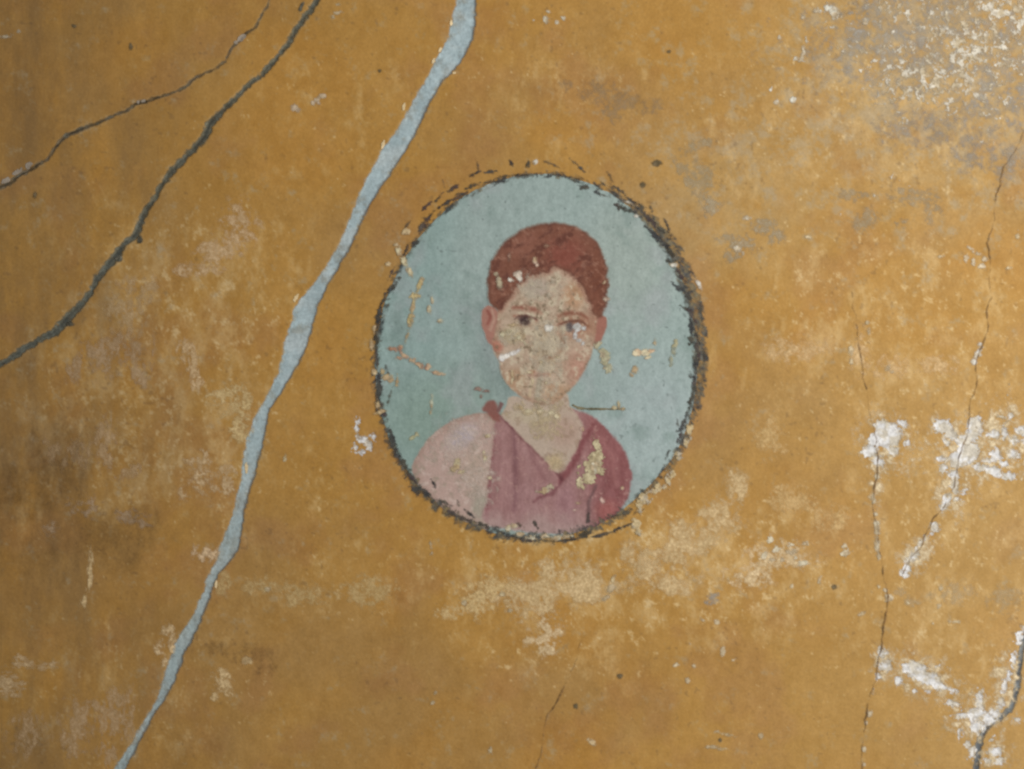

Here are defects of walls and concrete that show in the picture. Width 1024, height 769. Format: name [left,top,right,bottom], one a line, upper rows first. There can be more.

crack [0,0,320,367]
peeling [494,271,522,288]
crack [115,0,476,769]
peeling [499,323,526,383]
peeling [573,323,612,374]
spalling [860,418,910,480]
spalling [899,413,1024,578]
spalling [873,626,1024,765]
crack [973,632,1024,769]